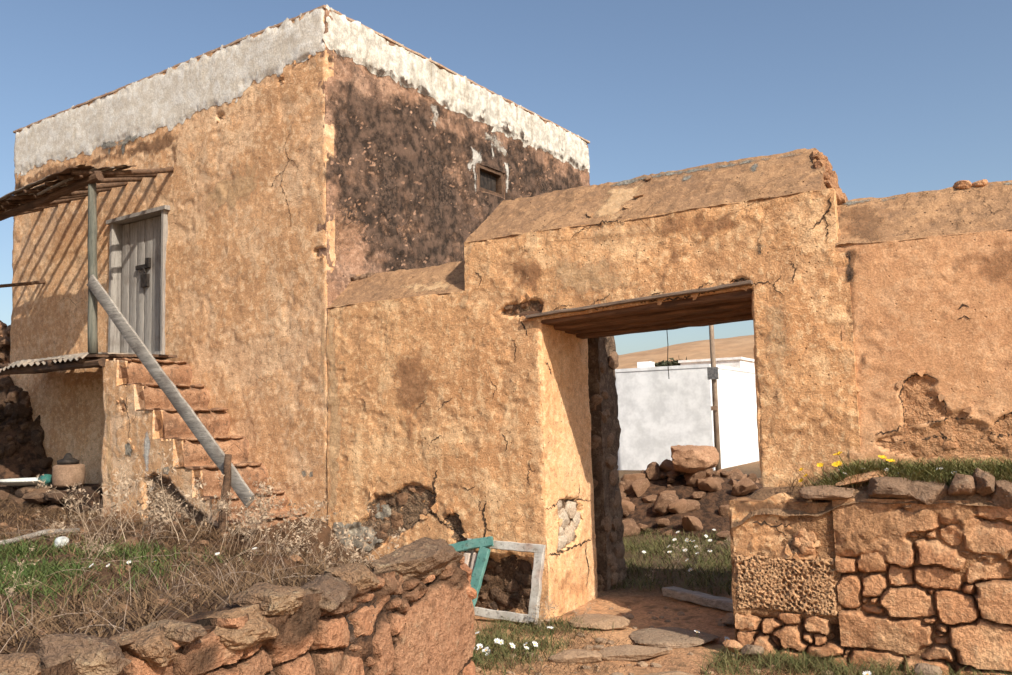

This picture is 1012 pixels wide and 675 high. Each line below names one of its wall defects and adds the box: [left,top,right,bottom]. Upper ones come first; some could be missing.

crack [271,135,298,225]
leakage [324,64,585,280]
crack [809,194,832,242]
leakage [514,260,541,288]
spalling [500,292,543,336]
leakage [395,355,429,438]
spalling [876,370,1012,467]
spalling [348,485,469,559]
spalling [557,499,585,552]